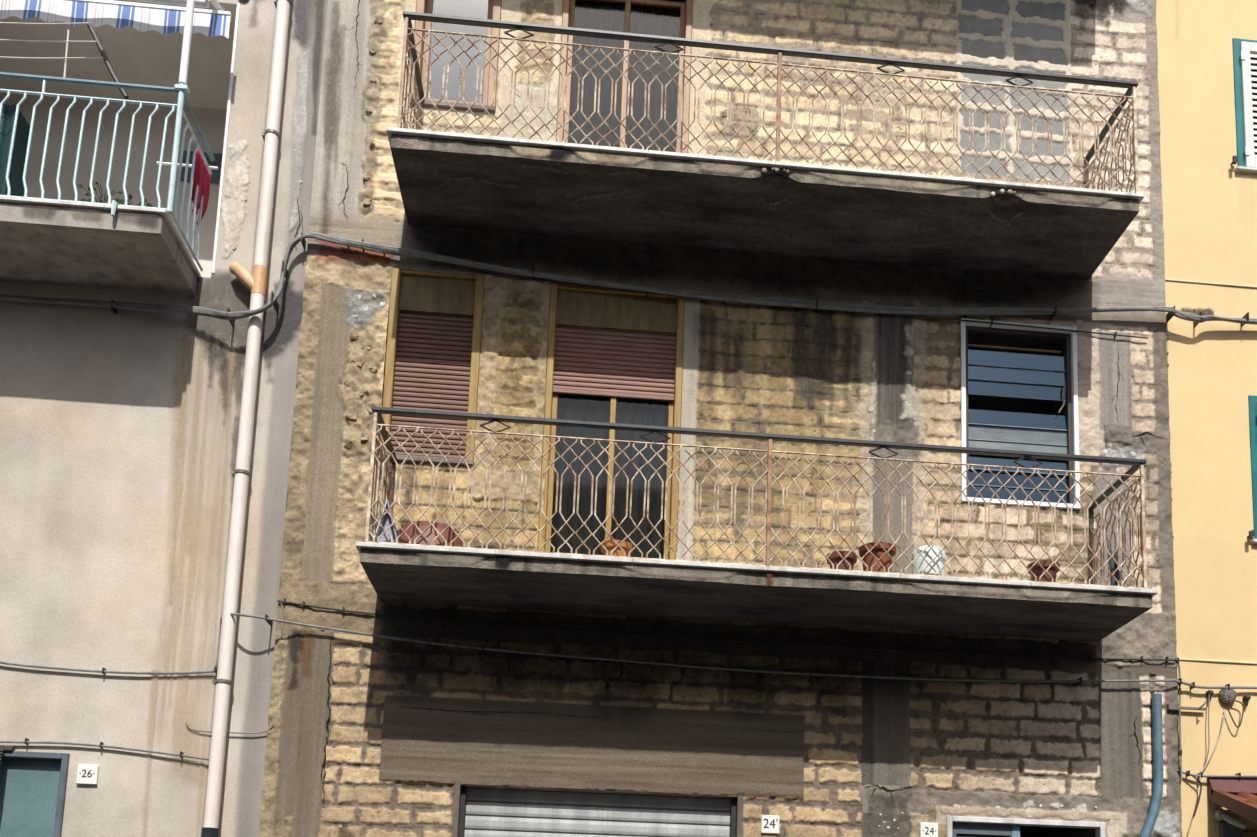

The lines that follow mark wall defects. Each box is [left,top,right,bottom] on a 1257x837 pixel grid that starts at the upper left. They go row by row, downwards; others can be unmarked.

leakage [1076,0,1126,22]
leakage [188,273,303,471]
leakage [792,308,855,406]